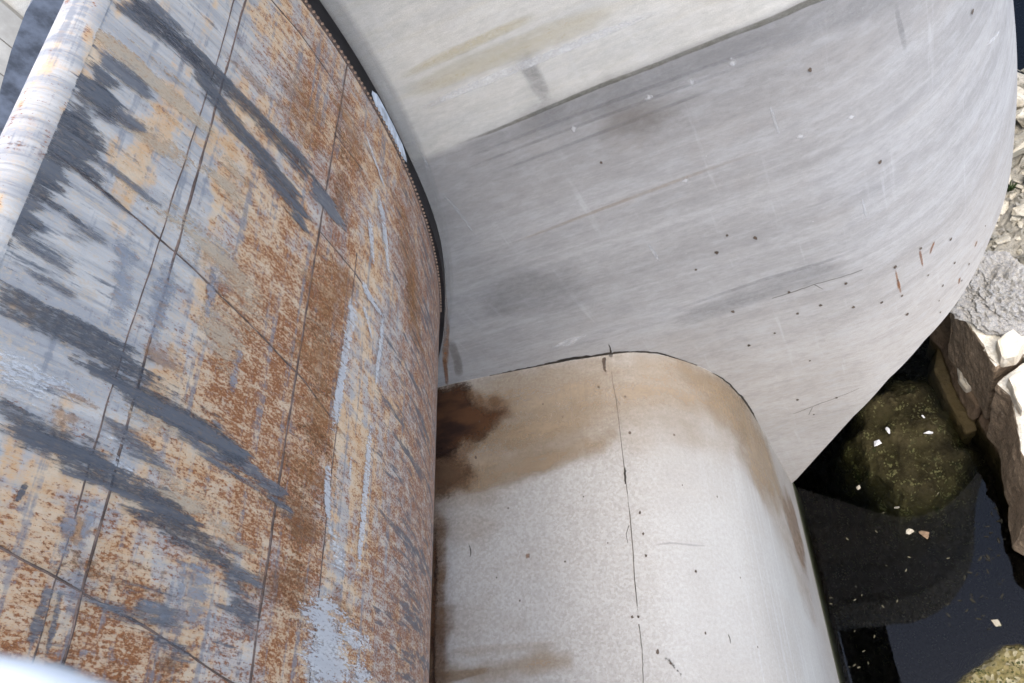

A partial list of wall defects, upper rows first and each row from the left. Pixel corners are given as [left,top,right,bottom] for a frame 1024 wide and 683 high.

damp [435,362,745,496]
corrosion [429,519,446,683]